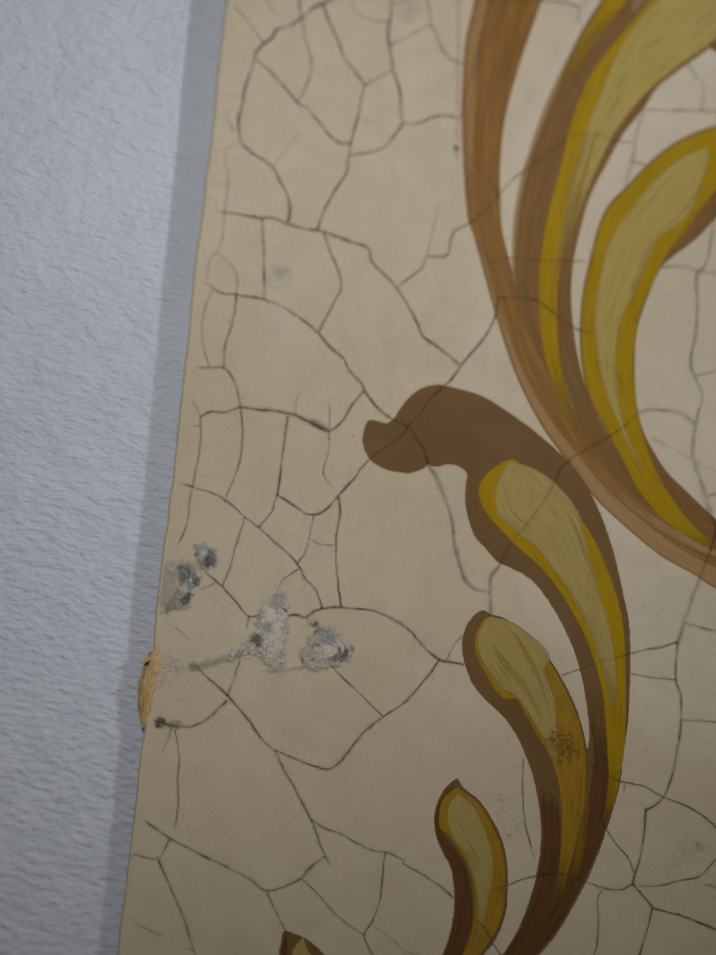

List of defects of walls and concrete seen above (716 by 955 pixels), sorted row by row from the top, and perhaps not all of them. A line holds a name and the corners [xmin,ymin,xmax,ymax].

crack [184,0,508,619]
spalling [162,543,217,613]
spalling [137,645,160,727]
crack [210,680,261,738]
spalling [301,624,354,671]
crack [280,625,464,770]
crack [630,627,707,740]
crack [522,760,531,845]
crack [300,800,419,955]
crack [593,773,716,955]